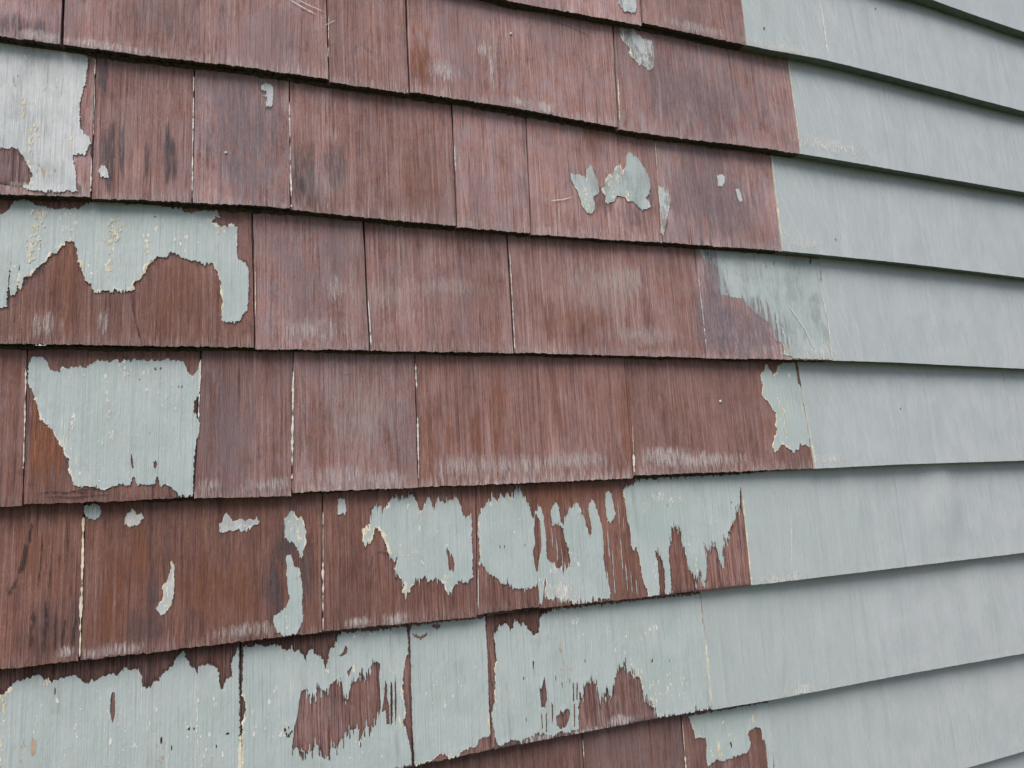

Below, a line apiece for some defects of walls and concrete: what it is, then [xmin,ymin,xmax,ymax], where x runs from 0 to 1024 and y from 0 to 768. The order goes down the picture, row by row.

peeling [620,27,654,71]
peeling [0,43,249,324]
peeling [570,152,670,235]
peeling [27,344,201,498]
peeling [700,249,832,453]
peeling [0,473,773,768]